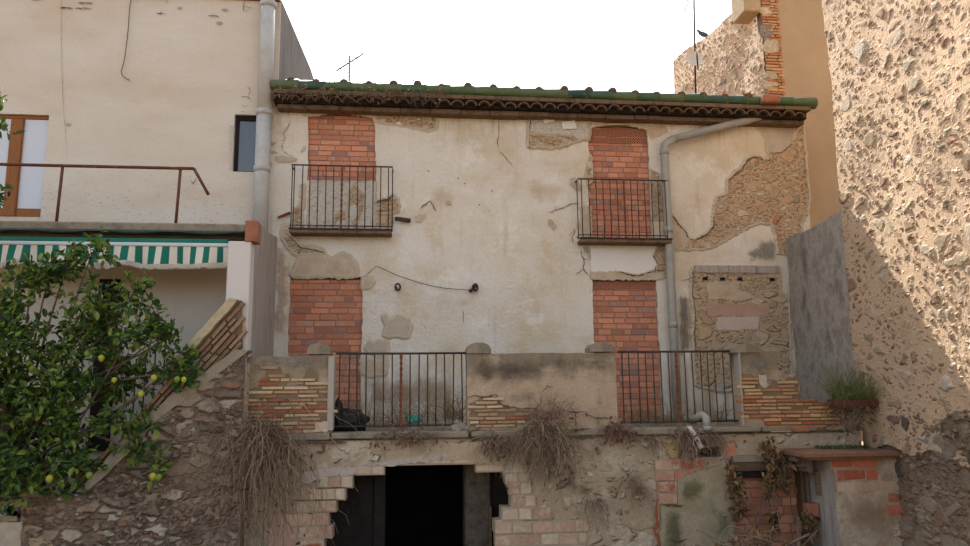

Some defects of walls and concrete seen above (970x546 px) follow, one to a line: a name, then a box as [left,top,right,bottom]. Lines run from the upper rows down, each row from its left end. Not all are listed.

flaking render [525,119,592,151]
flaking render [279,180,401,291]
flaking render [576,123,811,281]
flaking render [688,267,854,433]
flaking render [467,396,541,428]